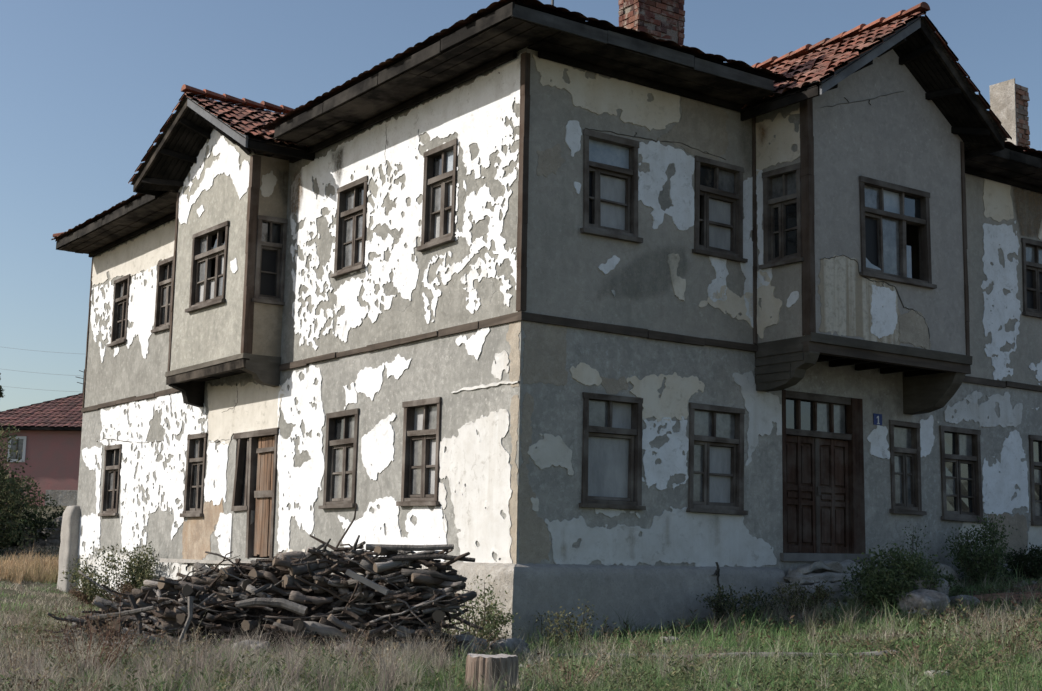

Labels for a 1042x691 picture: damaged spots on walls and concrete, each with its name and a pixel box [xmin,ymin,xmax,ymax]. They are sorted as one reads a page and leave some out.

peeling [90,129,277,363]
peeling [78,364,326,595]
peeling [343,354,412,410]
peeling [338,409,513,563]
peeling [455,327,491,360]
peeling [290,53,695,350]
peeling [530,497,777,567]
peeling [626,372,705,490]
peeling [699,108,800,339]
peeling [733,371,782,466]
peeling [870,285,897,339]
peeling [919,178,1042,556]